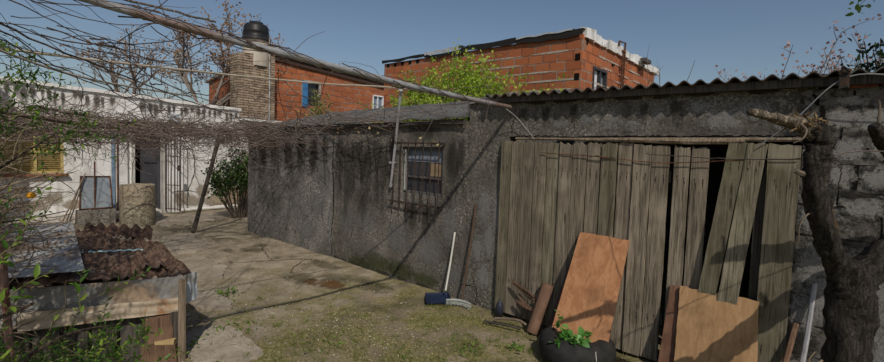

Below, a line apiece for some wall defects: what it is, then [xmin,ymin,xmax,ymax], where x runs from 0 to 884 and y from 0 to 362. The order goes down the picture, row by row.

damp [251,135,457,262]
peeling [827,96,884,219]